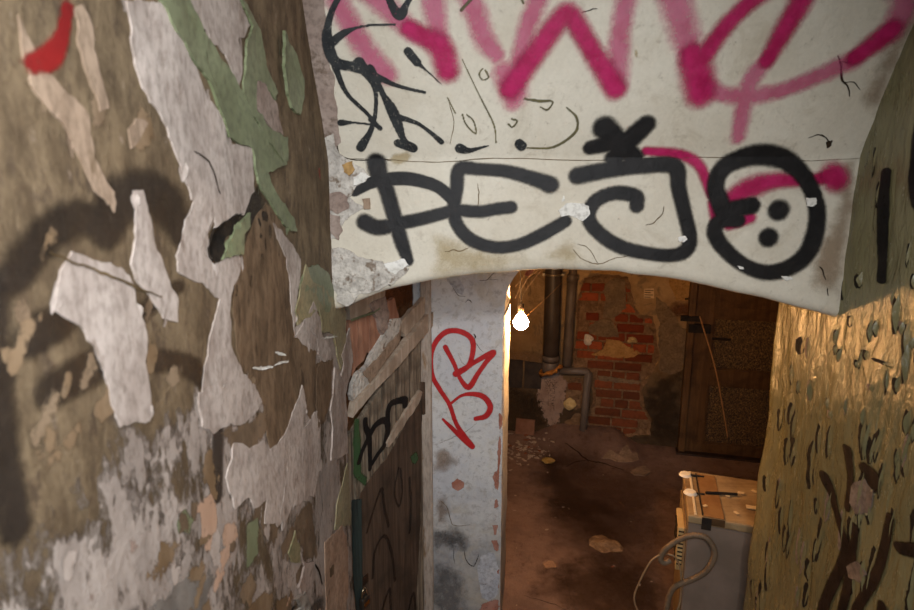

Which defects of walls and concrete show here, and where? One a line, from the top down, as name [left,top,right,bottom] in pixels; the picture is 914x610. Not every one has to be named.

spalling [0,0,409,610]
spalling [565,274,660,437]
peeling [832,315,853,362]
peeling [840,272,864,300]
peeling [854,291,914,395]
peeling [750,335,914,610]
damp [435,532,465,548]